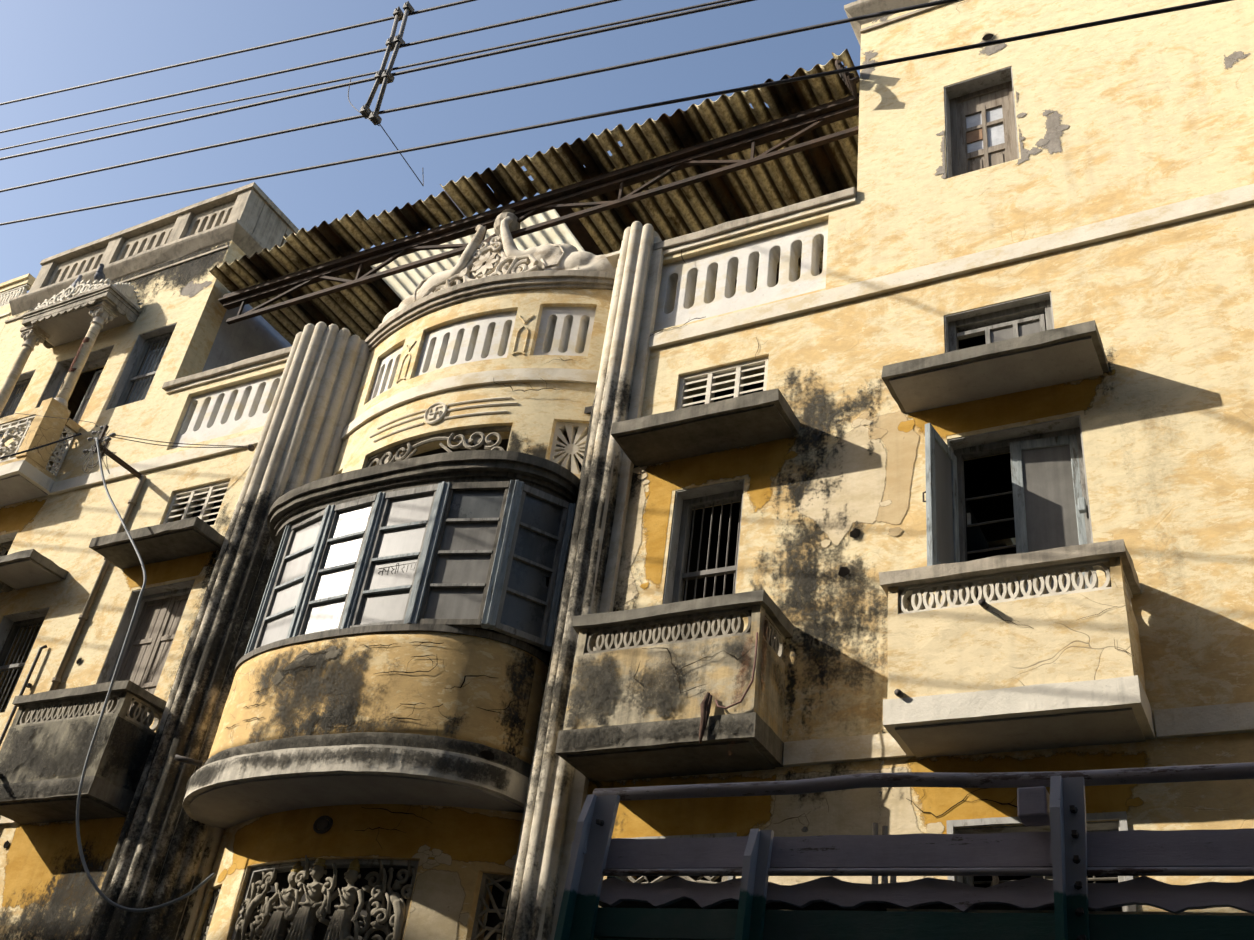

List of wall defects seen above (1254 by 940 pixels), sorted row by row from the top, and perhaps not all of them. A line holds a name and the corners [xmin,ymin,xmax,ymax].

flaking render [935,130,946,179]
flaking render [1016,91,1069,165]
leakage [111,241,230,307]
peeling [796,411,919,548]
leakage [723,368,888,733]
crack [226,651,328,743]
leakage [0,373,750,940]
crack [363,642,515,720]
crack [634,646,755,693]
peeling [764,767,944,837]
peeling [768,876,934,885]